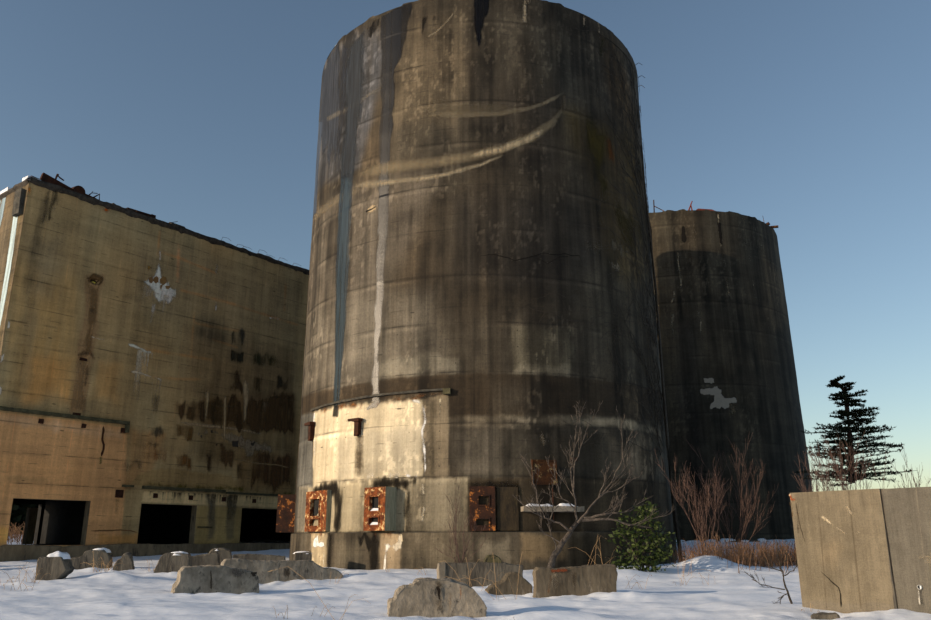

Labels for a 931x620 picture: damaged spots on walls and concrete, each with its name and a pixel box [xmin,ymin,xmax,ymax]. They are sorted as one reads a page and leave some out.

water stain [313,3,412,417]
crack [716,215,724,244]
crack [671,226,687,332]
rust [78,288,97,356]
peeling [700,378,737,409]
crack [98,426,106,464]